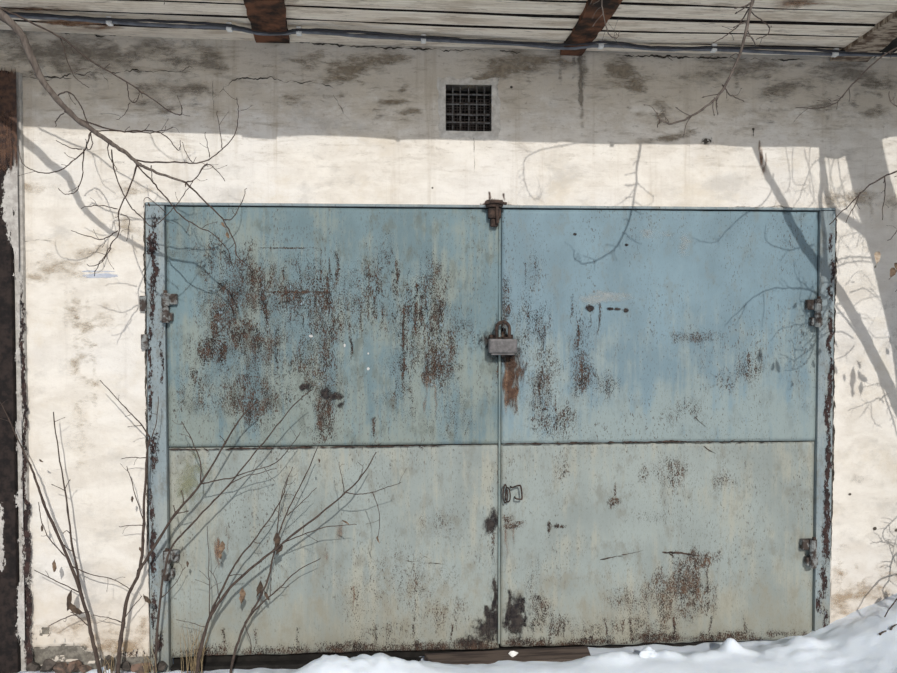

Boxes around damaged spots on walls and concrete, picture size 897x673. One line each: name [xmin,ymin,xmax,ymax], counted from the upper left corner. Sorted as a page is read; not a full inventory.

leakage [0,30,228,73]
leakage [326,51,405,84]
leakage [469,51,587,106]
leakage [605,56,644,92]
leakage [820,63,889,89]
leakage [380,89,418,115]
rust [477,252,541,412]
rust [421,345,447,392]
peeling [1,164,478,673]
rust [171,548,807,657]
leakage [835,592,868,607]